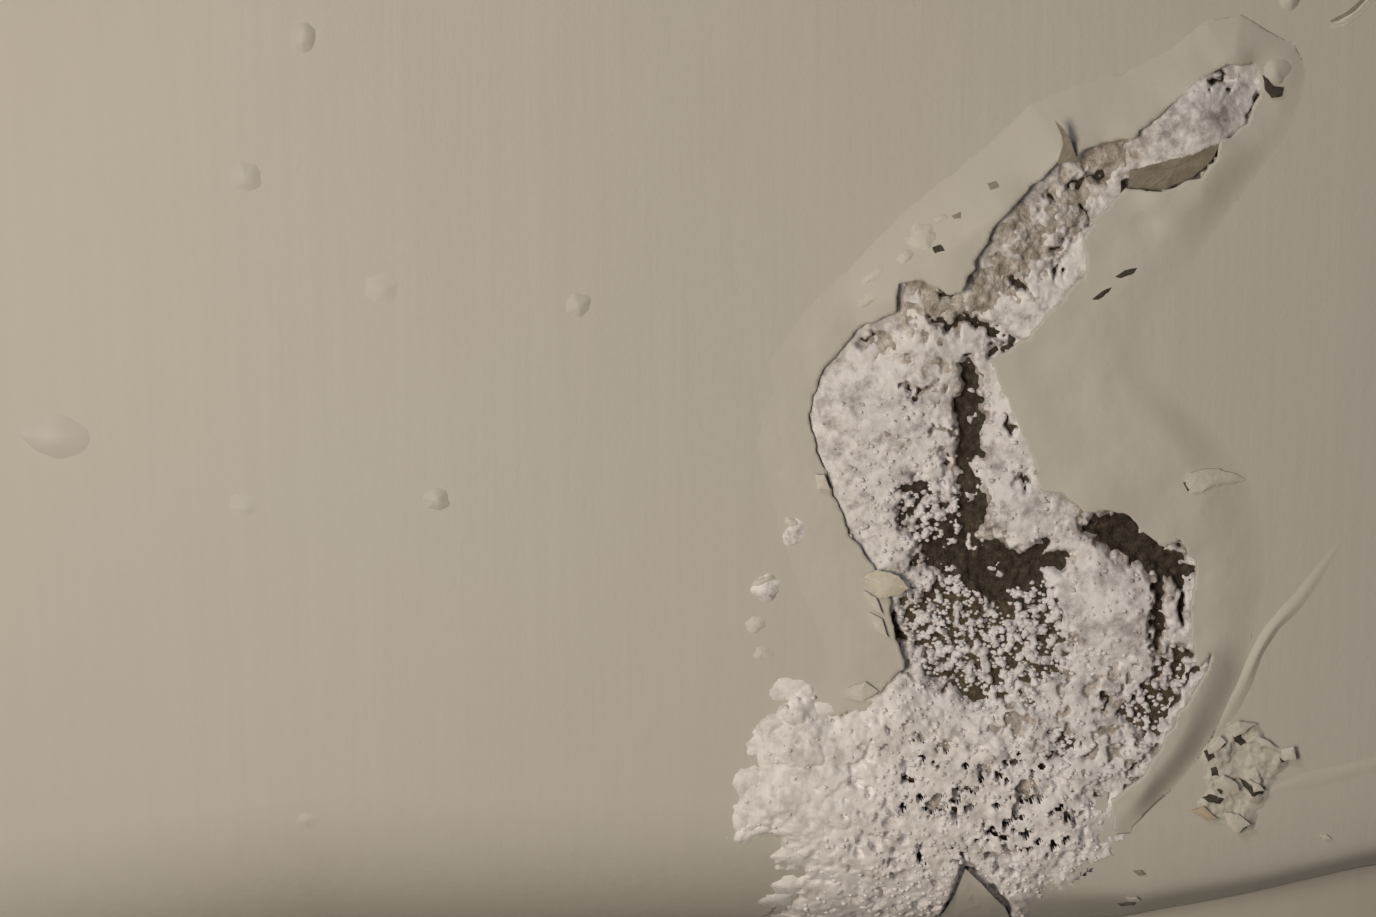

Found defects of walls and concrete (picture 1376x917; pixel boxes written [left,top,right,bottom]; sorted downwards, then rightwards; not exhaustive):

spalling [809,63,1262,917]
leakage [732,672,1114,917]
peeling [1191,721,1296,833]